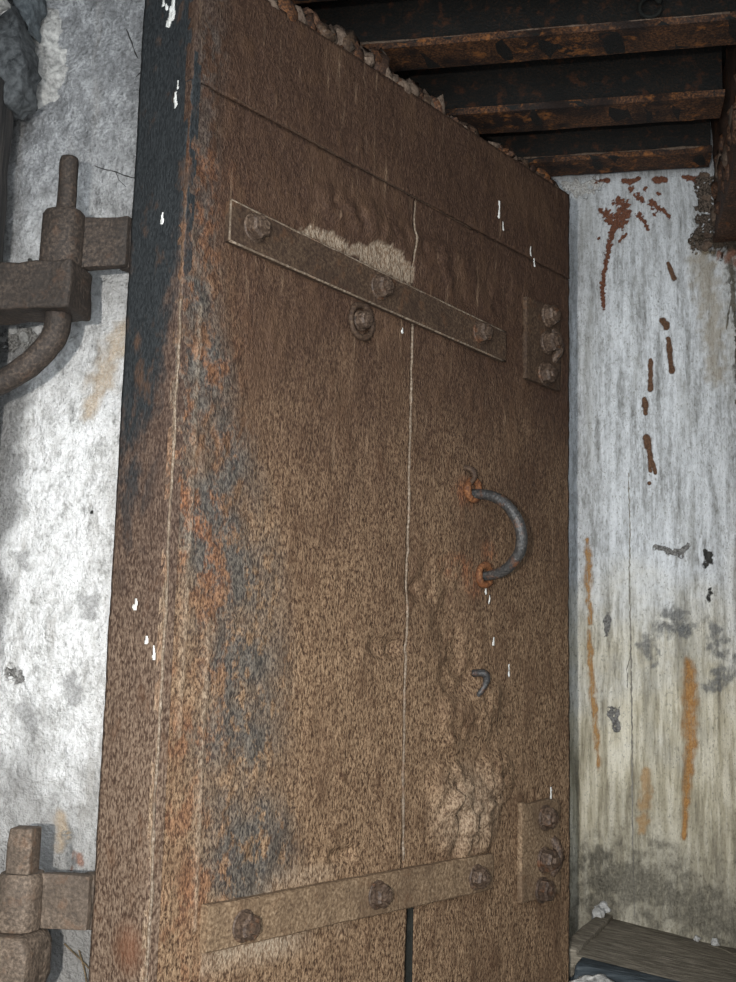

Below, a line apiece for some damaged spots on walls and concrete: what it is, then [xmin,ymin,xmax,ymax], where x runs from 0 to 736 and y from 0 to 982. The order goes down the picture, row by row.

corrosion [268,0,559,188]
corrosion [711,68,736,215]
corrosion [594,176,671,310]
corrosion [641,358,653,416]
corrosion [659,318,675,374]
corrosion [643,434,657,485]
corrosion [585,538,600,767]
leakage [658,610,691,638]
leakage [703,624,736,692]
corrosion [682,659,697,840]